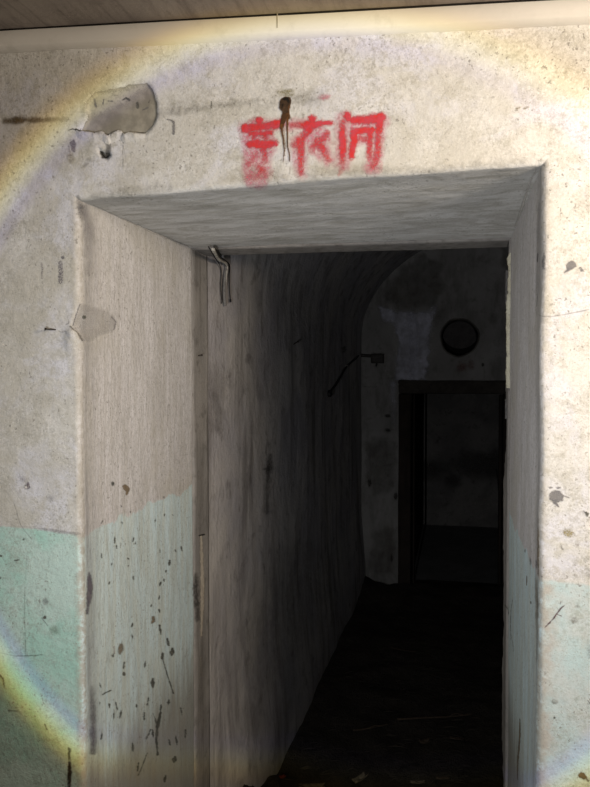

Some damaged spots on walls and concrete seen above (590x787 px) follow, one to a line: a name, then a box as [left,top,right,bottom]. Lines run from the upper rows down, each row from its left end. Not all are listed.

flaking render [70,83,157,158]
rust [279,97,291,161]
efflorescence [379,307,435,380]